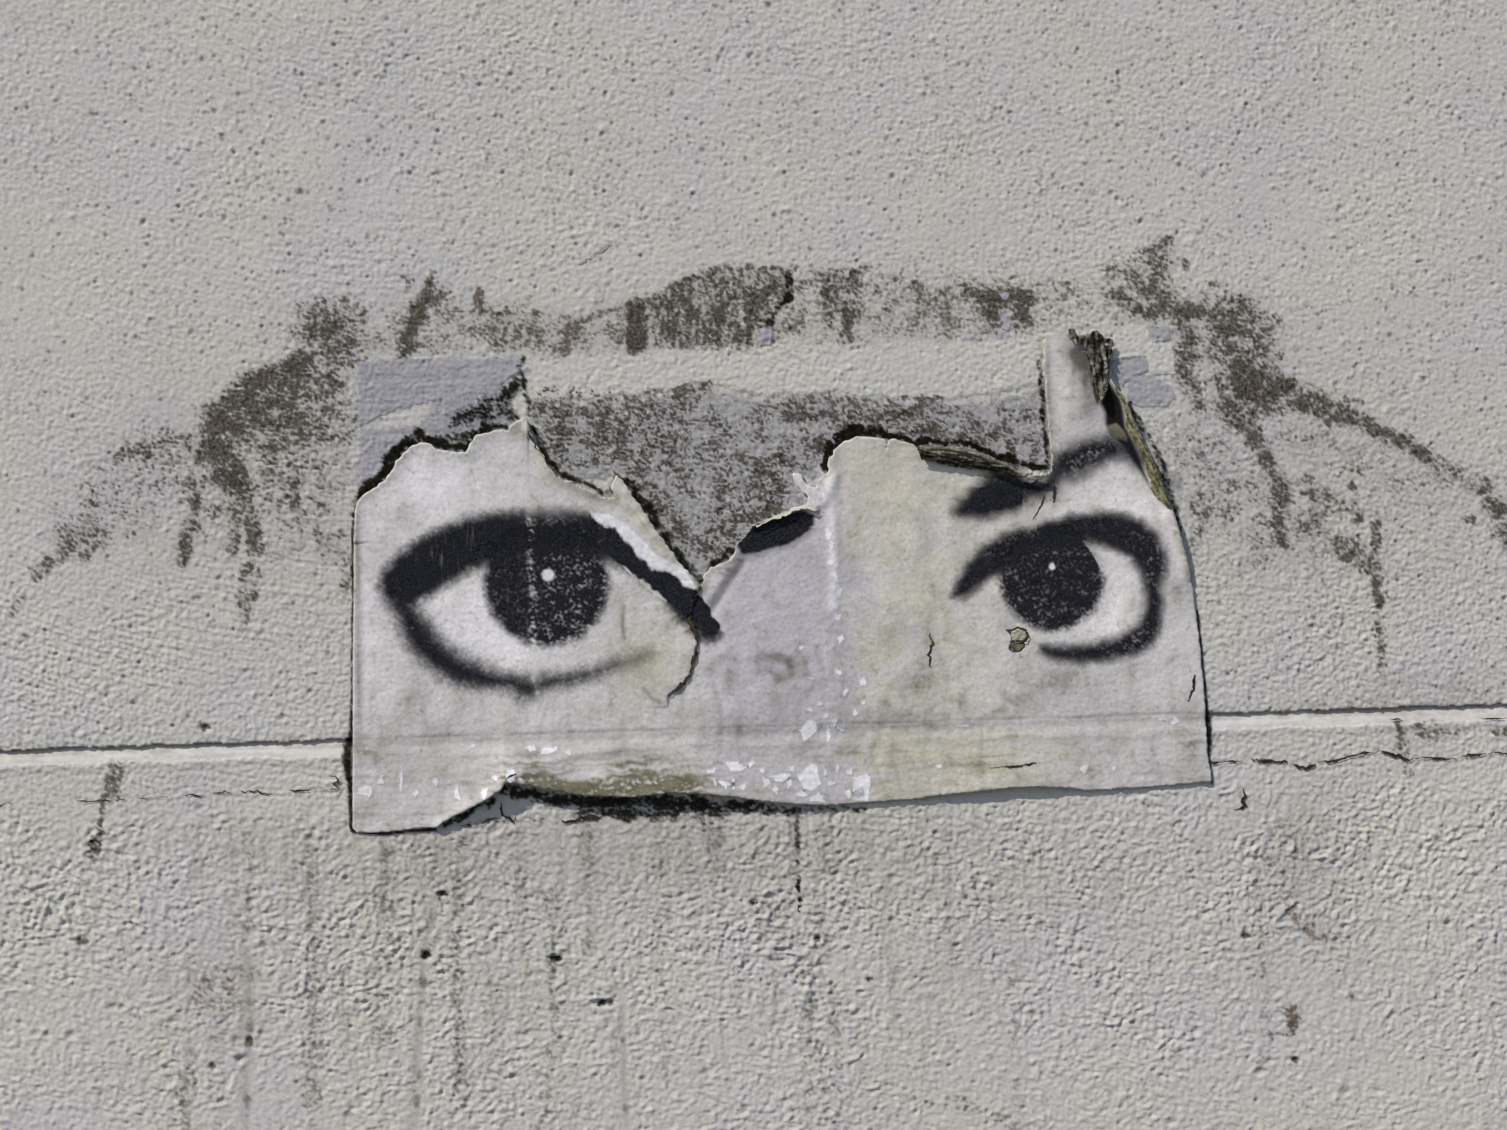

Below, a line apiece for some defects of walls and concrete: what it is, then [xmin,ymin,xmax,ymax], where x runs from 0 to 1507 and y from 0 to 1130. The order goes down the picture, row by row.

peeling [1112,325,1177,454]
peeling [357,337,1051,575]
peeling [1164,472,1182,491]
crack [1210,718,1507,811]
leakage [194,968,254,1006]